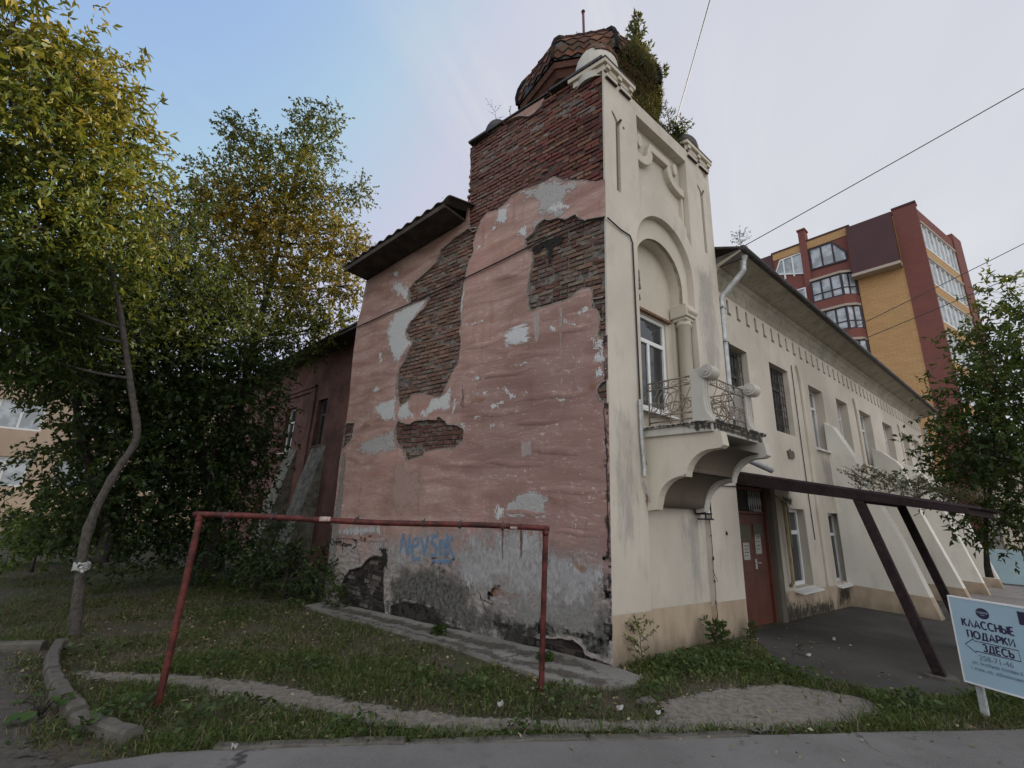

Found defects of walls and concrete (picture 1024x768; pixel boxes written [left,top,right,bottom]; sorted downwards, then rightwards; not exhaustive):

flaking render [319,422,464,631]
leakage [338,526,610,657]
flaking render [373,75,604,461]
flaking render [503,200,610,560]